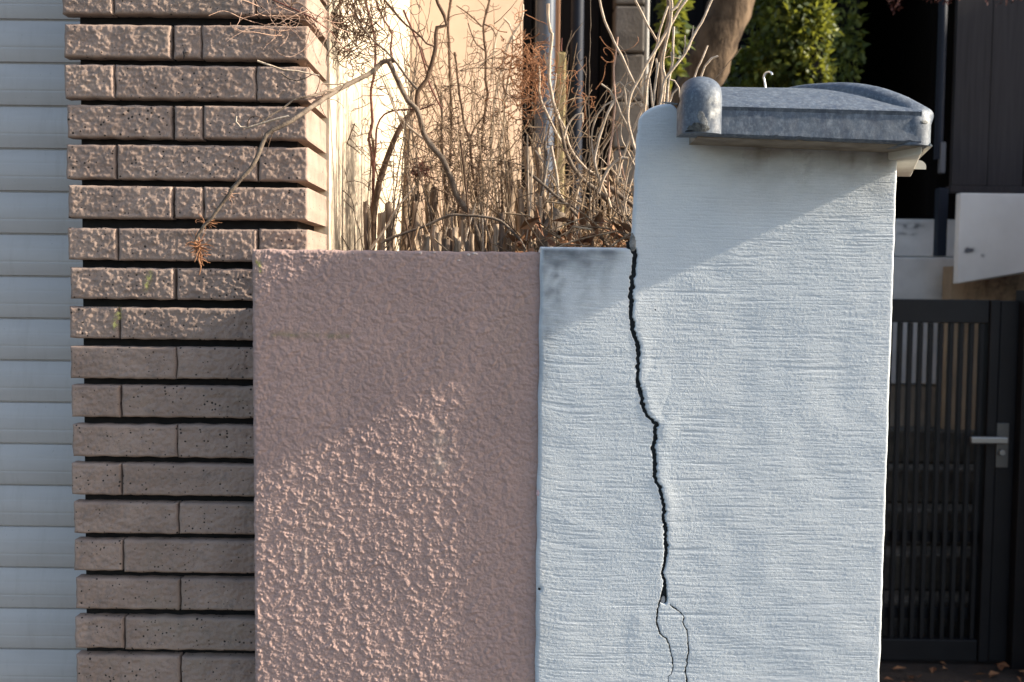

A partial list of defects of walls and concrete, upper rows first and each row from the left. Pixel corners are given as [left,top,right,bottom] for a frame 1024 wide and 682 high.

crack [625,241,689,682]